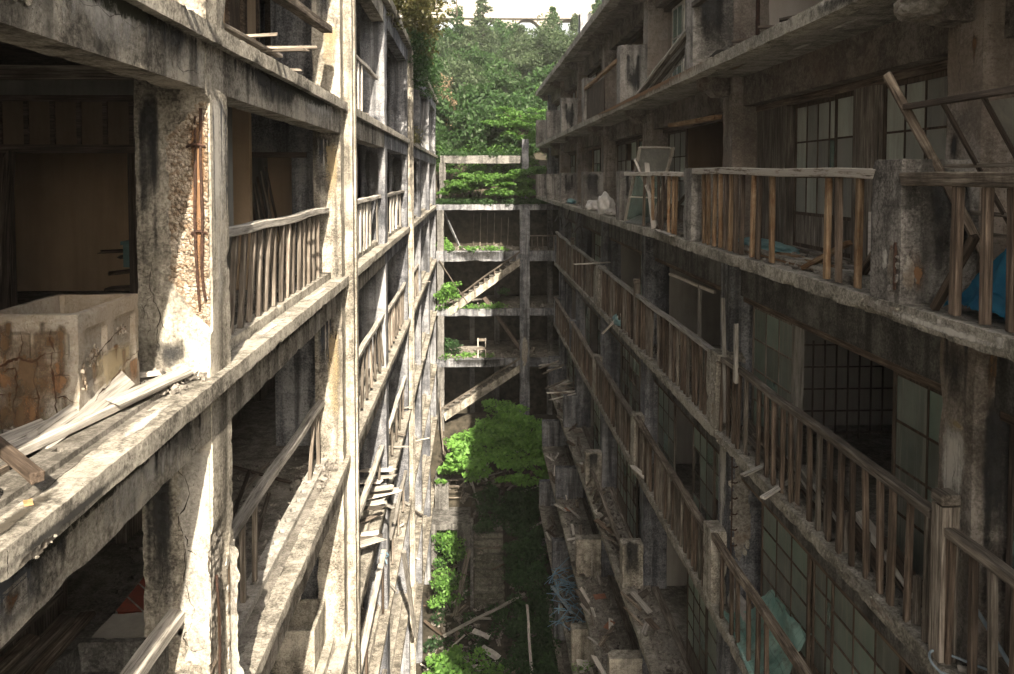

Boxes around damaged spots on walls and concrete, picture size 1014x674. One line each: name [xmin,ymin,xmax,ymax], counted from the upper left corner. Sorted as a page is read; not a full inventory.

water stain [627,55,639,89]
water stain [139,97,159,206]
corrosion [191,123,204,284]
crack [0,263,165,423]
water stain [159,341,184,367]